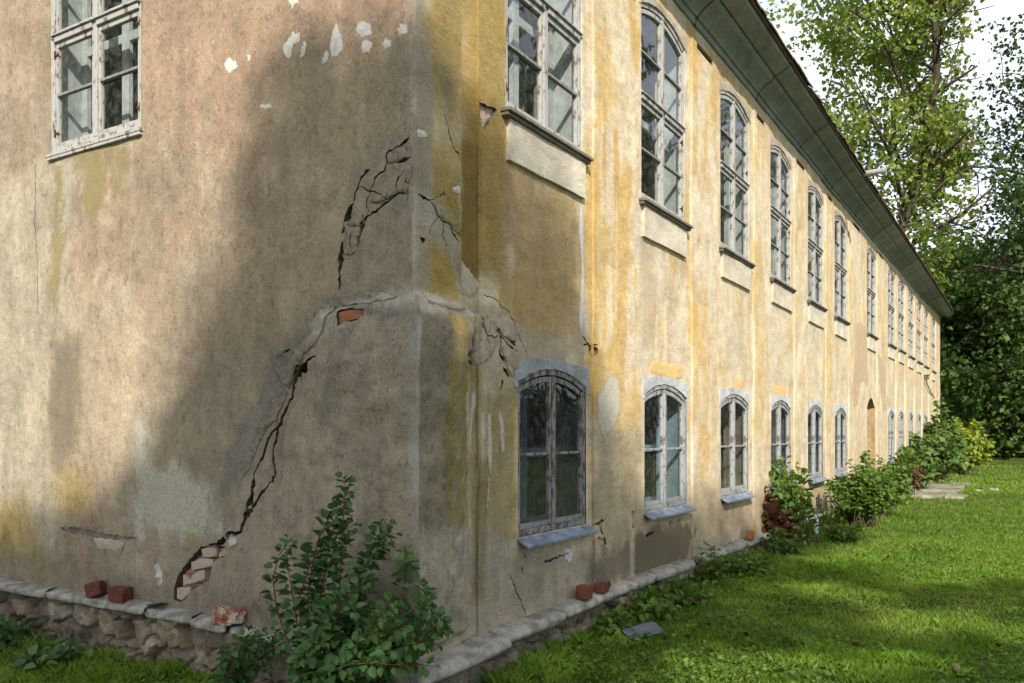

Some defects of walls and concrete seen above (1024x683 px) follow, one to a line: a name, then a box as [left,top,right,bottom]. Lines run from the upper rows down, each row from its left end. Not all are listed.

flaking render [224,52,253,74]
flaking render [283,30,308,58]
flaking render [322,21,351,64]
flaking render [356,21,409,54]
flaking render [479,103,497,129]
crack [338,138,457,292]
flaking render [272,291,397,388]
crack [468,294,526,388]
crack [208,350,317,548]
flaking render [61,527,137,551]
flaking render [173,536,237,602]